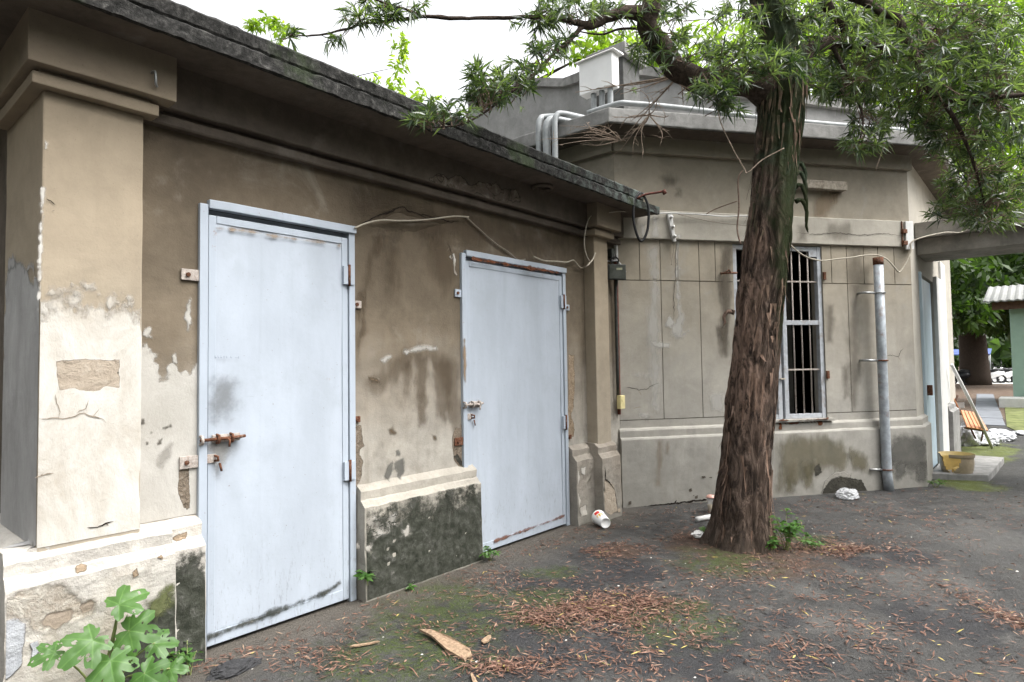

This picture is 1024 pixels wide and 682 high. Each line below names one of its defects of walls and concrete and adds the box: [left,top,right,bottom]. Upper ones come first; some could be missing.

corrosion [472,256,559,273]
crack [47,395,105,421]
peeling [0,255,197,550]
damp [385,450,404,479]
damp [780,439,866,490]
damp [891,436,927,481]
peeling [577,462,587,517]
flaking render [604,480,631,515]
mould [366,484,483,600]
corrosion [494,515,565,543]
mould [122,551,205,682]